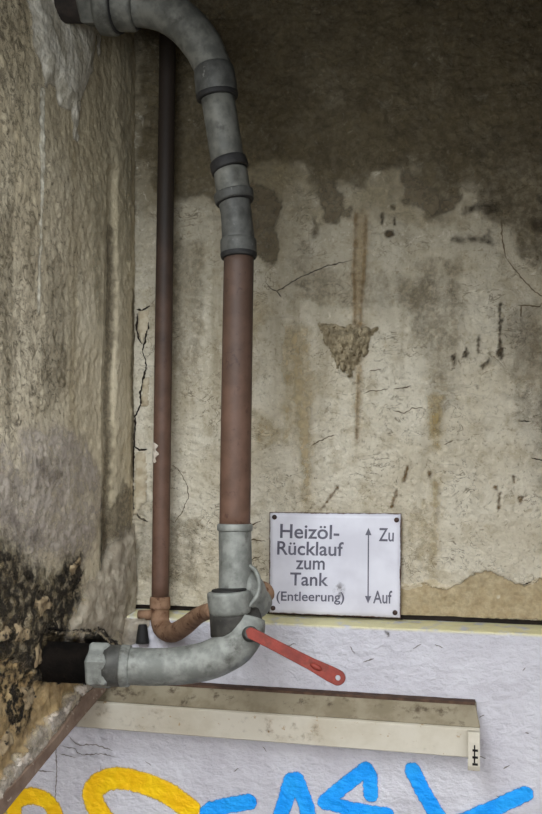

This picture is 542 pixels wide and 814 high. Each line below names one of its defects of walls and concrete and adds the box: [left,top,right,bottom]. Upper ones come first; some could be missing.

leakage [104,226,113,407]
crack [266,260,350,297]
crack [501,219,542,316]
crack [132,306,150,522]
leakage [0,422,132,736]
spalling [401,571,542,621]